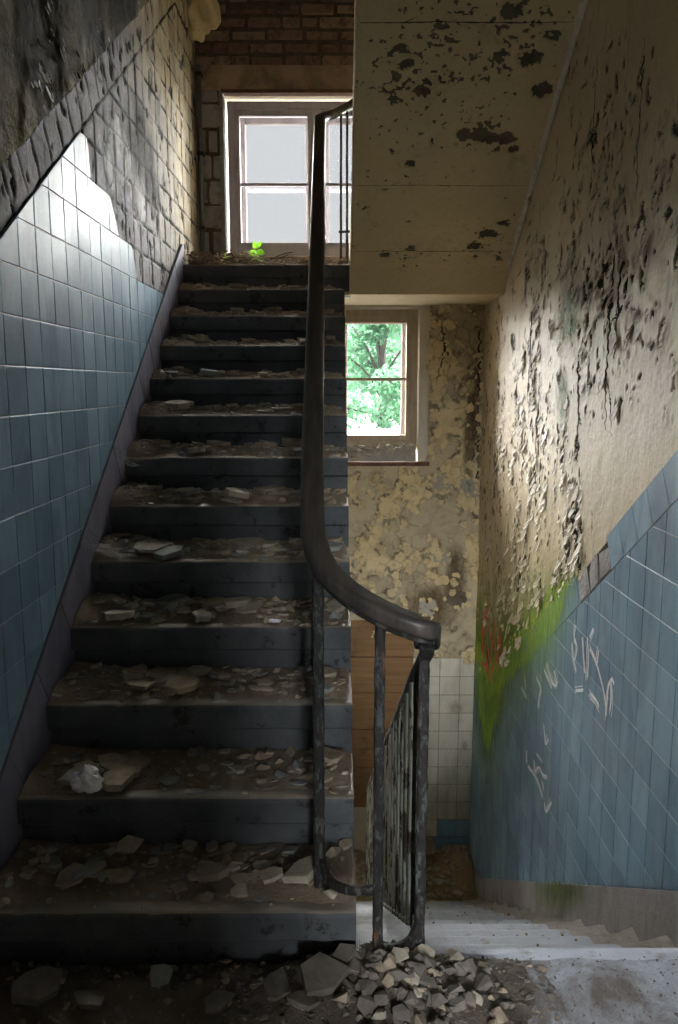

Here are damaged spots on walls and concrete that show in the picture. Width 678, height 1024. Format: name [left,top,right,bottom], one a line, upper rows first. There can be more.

peeling [0,0,355,294]
flaking render [325,0,678,667]
leakage [475,583,567,704]